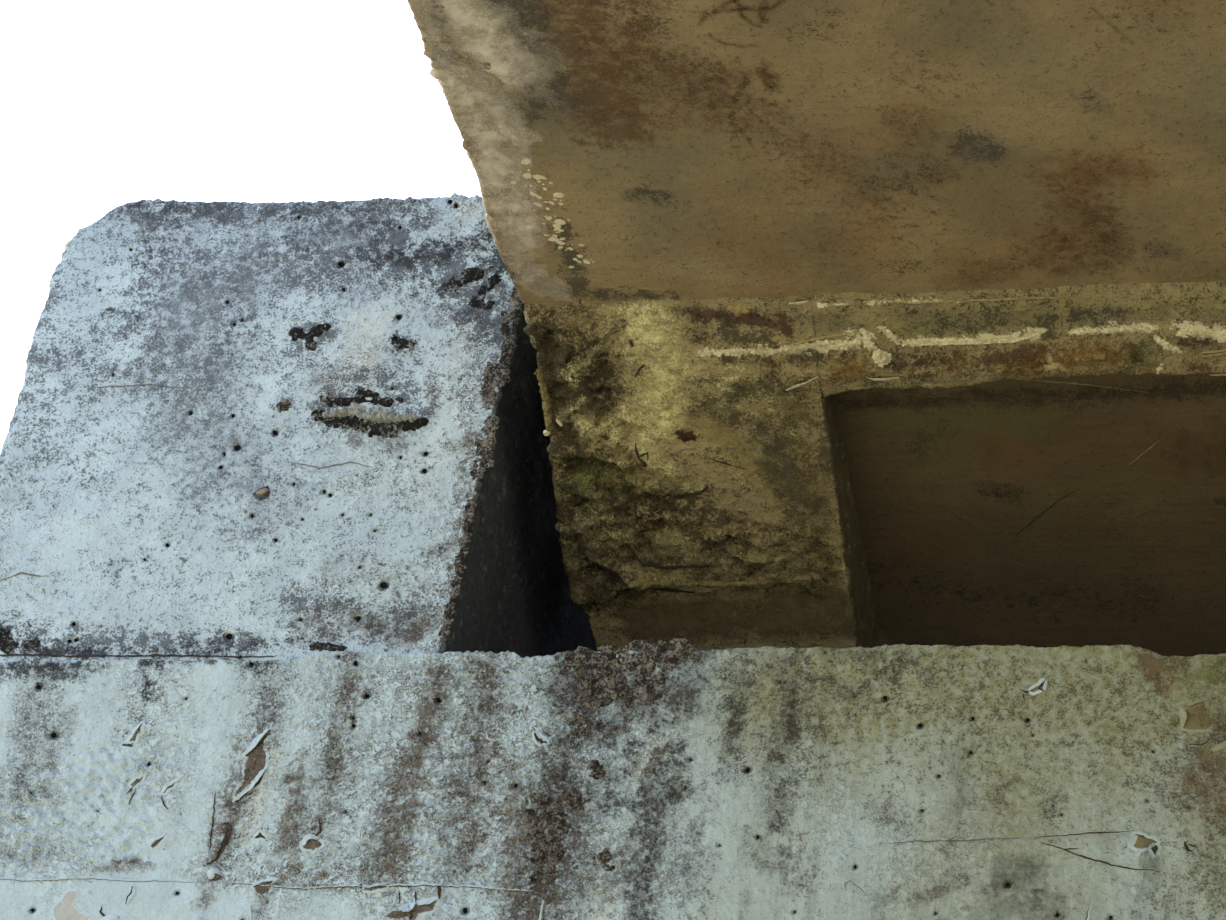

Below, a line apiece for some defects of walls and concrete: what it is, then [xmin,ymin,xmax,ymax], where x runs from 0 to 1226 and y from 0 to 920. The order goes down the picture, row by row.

water stain [409,0,697,298]
water stain [816,293,1068,309]
spalling [311,386,429,439]
water stain [199,673,281,909]
peeling [232,728,275,803]
water stain [278,652,360,853]
water stain [362,650,503,884]
peeling [1179,698,1226,759]
peeling [207,792,233,865]
crack [881,830,1159,872]
peeling [50,888,119,920]
peeling [359,882,441,920]